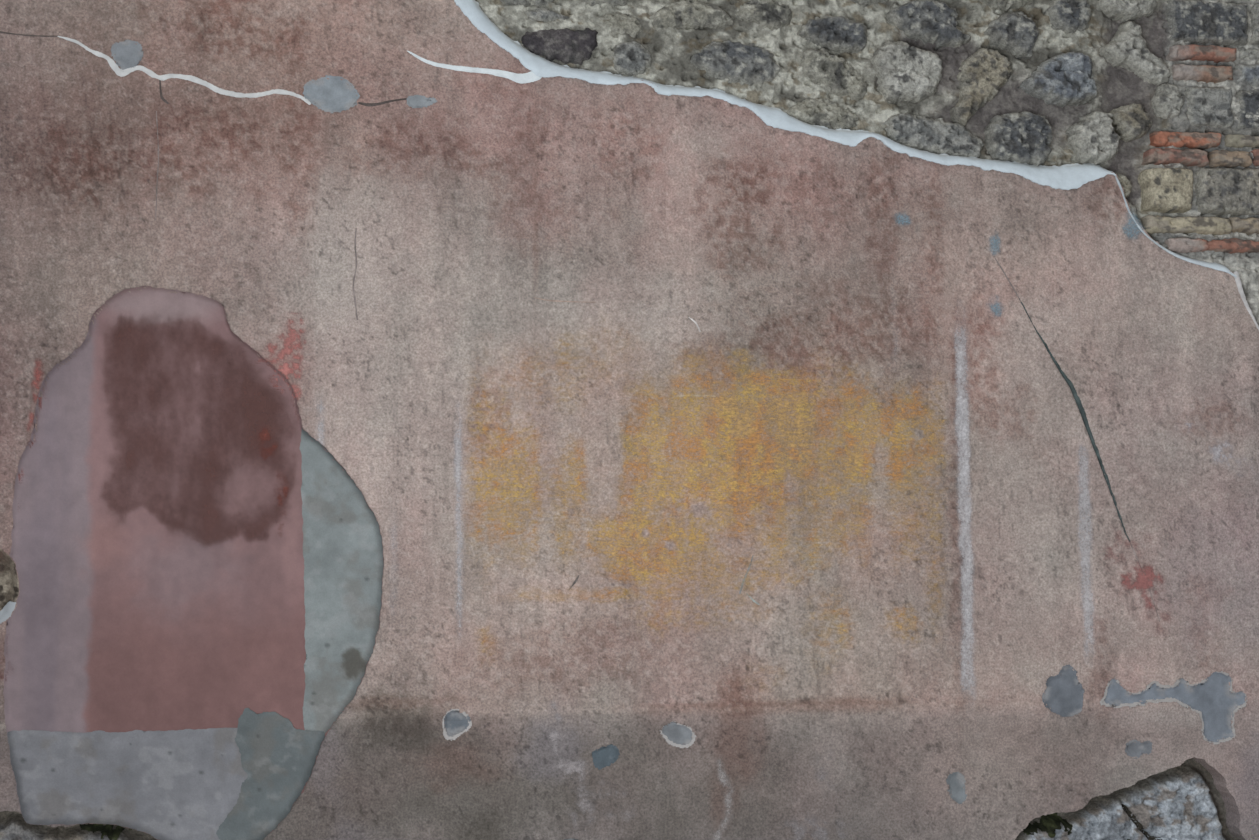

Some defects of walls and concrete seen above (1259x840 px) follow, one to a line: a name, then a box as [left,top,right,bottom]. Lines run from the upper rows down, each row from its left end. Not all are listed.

crack [0,31,311,105]
crack [358,98,407,107]
spalling [475,0,1259,325]
damp [109,319,305,544]
crack [995,258,1160,622]
flaking render [0,286,384,840]
spalling [1015,758,1241,840]
spalling [1100,671,1247,744]